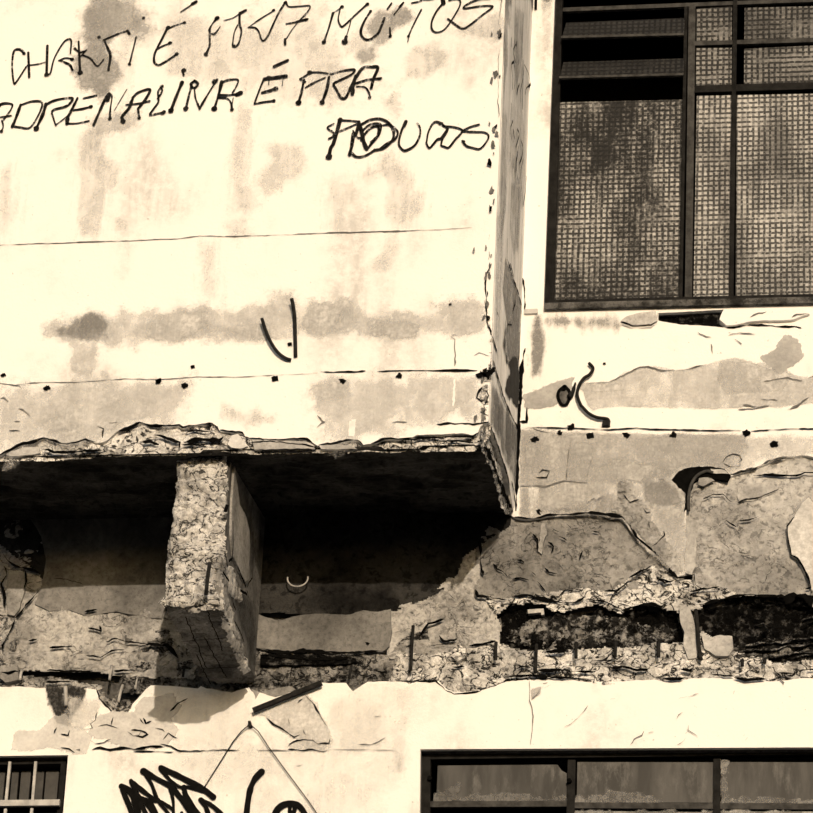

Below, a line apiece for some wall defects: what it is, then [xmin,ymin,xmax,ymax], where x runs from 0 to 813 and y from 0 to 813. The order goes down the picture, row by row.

leakage [72,0,149,96]
leakage [0,292,484,446]
spalling [0,245,813,751]